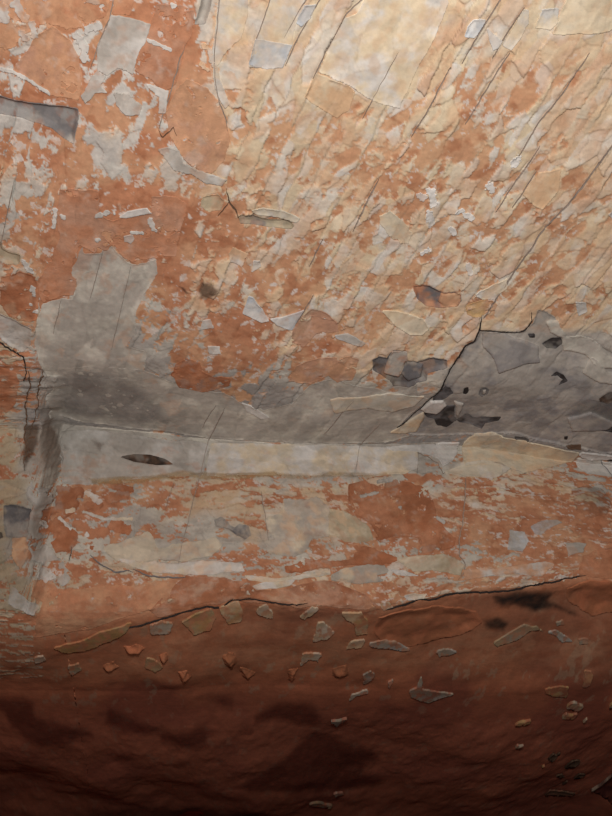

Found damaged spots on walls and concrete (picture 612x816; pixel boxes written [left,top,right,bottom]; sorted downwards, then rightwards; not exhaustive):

peeling [0,0,300,229]
peeling [249,0,316,69]
crack [313,0,362,78]
peeling [305,0,449,118]
crack [411,0,501,137]
peeling [465,0,612,50]
crack [496,53,589,212]
crack [353,145,612,473]
crack [0,342,44,471]
spalling [0,187,612,676]
crack [129,598,307,628]
peeling [409,676,453,704]